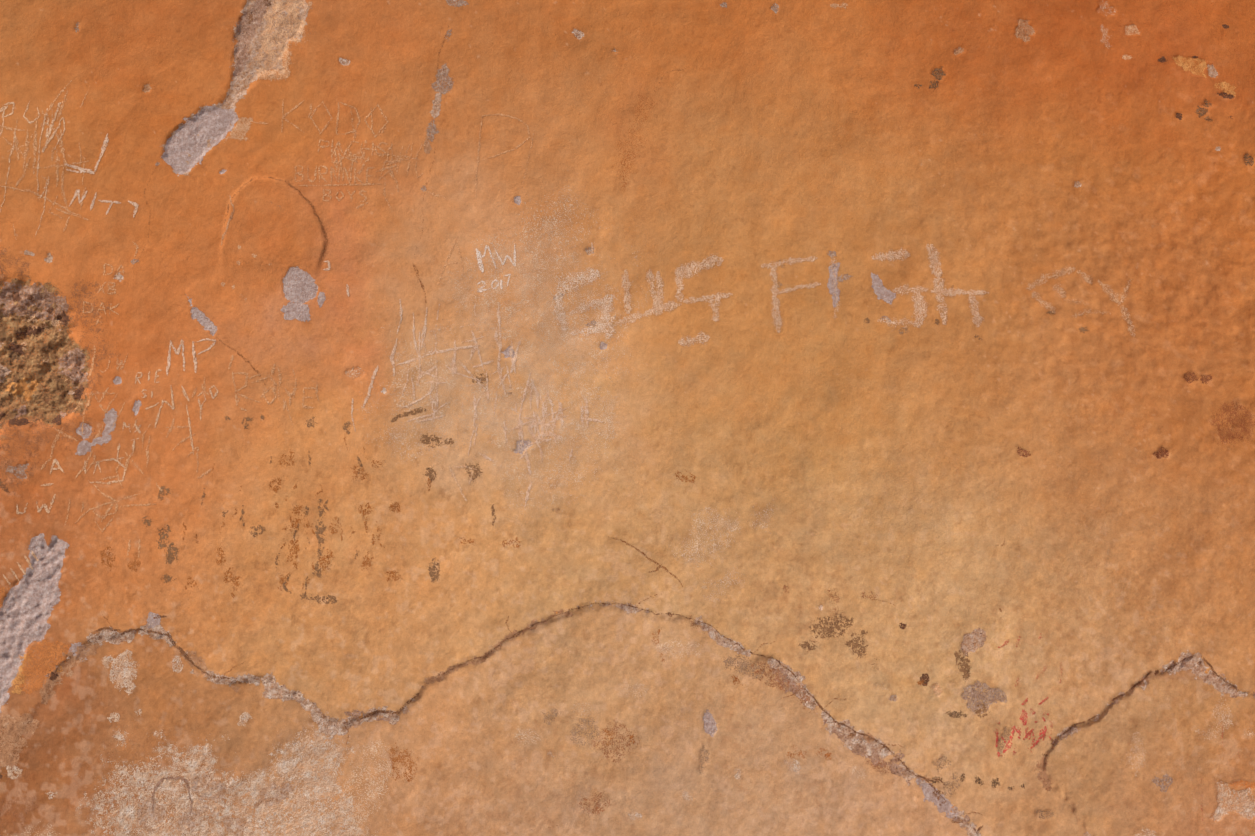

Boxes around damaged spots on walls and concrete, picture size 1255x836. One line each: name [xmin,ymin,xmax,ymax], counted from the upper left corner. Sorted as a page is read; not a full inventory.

flaking render [161,0,312,176]
peeling [1158,55,1236,122]
flaking render [0,246,122,501]
peeling [281,266,326,322]
flaking render [0,533,973,836]
crack [43,537,982,836]
peeling [961,681,1008,714]
crack [1034,650,1255,791]
flaking render [1042,656,1255,836]